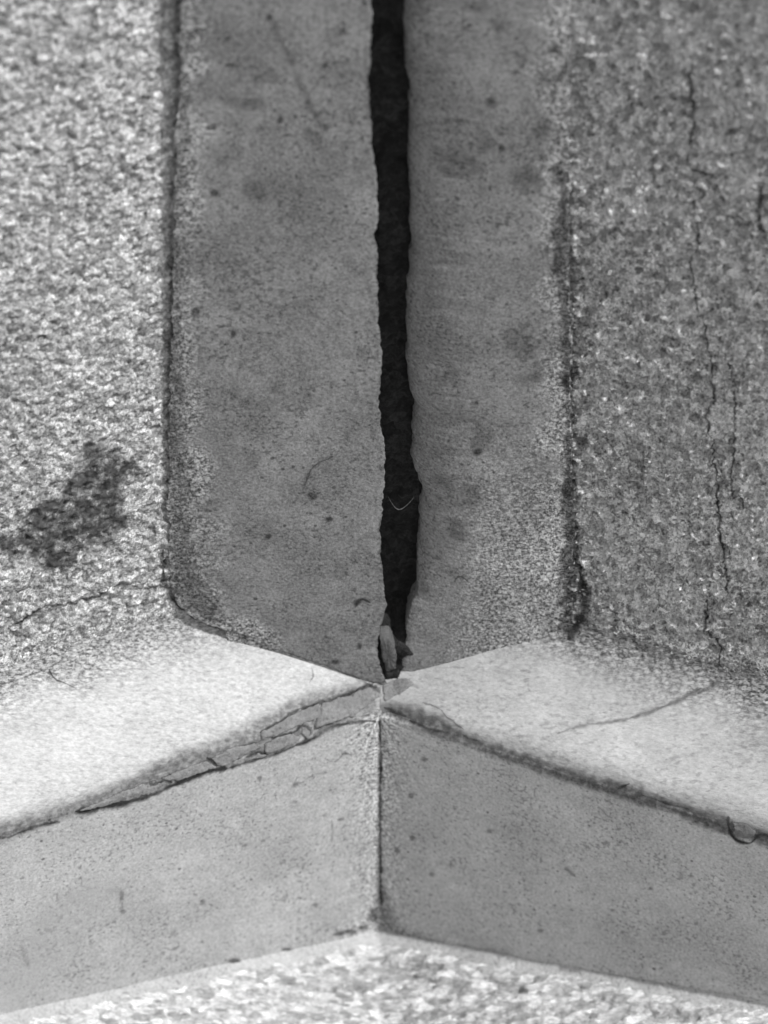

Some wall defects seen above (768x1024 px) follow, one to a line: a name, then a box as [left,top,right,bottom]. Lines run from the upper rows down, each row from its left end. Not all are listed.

crack [726,179,765,233]
water stain [0,443,136,572]
crack [631,66,752,718]
crack [2,653,478,905]